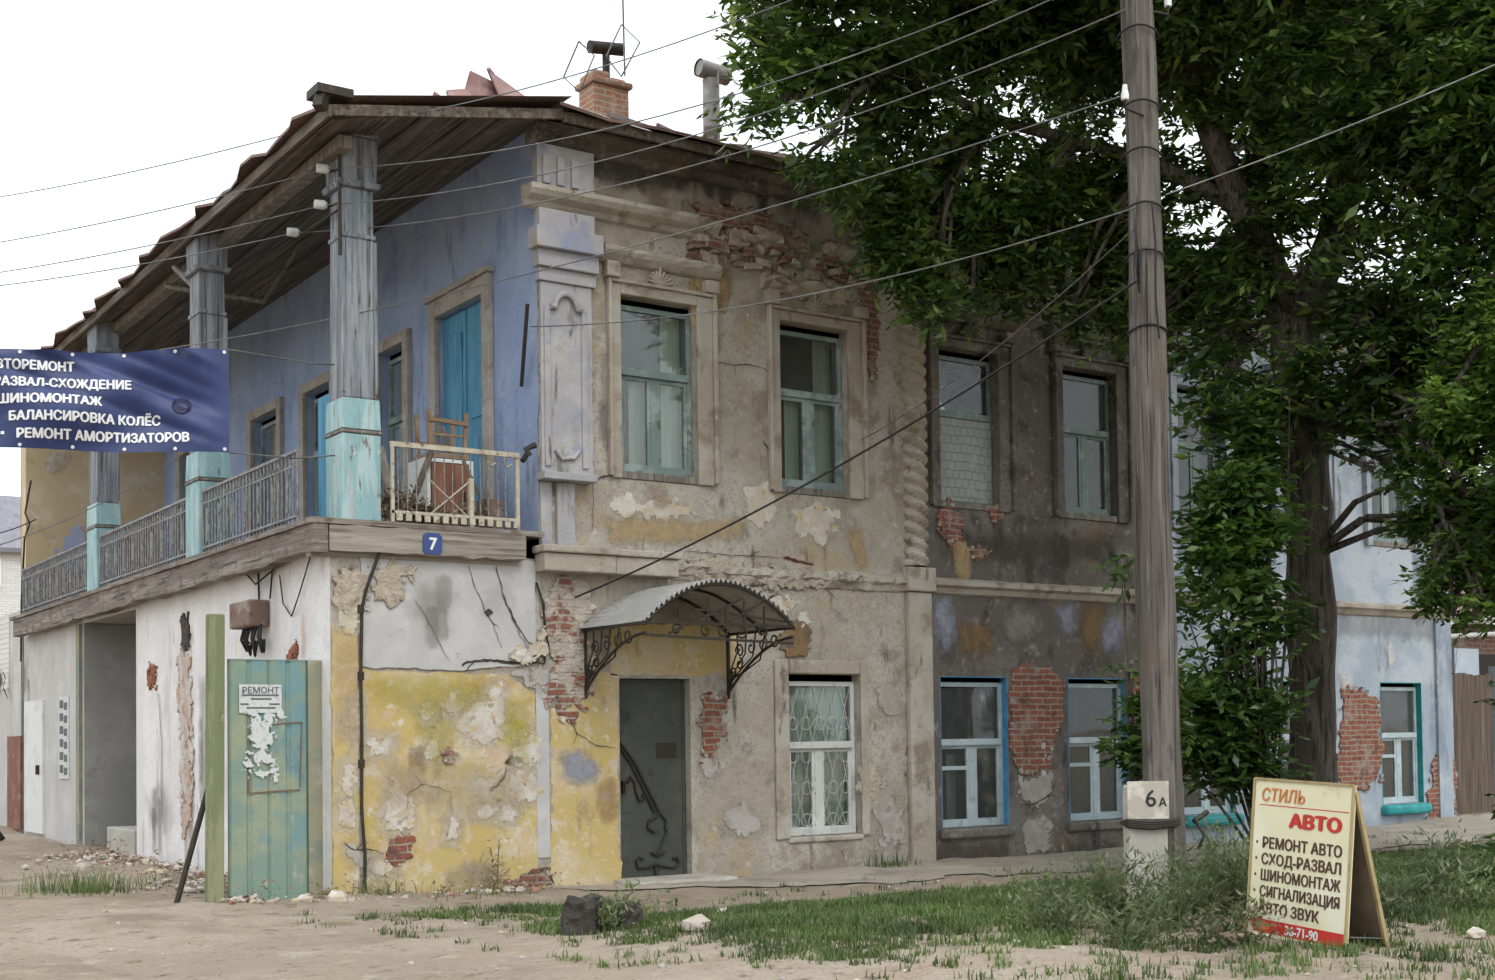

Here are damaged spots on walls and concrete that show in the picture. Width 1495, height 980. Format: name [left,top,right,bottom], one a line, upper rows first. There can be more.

spalling [680,199,881,383]
peeling [609,492,697,523]
peeling [743,480,841,546]
spalling [936,497,993,562]
spalling [331,557,418,635]
peeling [338,703,418,876]
spalling [418,575,598,823]
crack [416,566,616,748]
spalling [696,692,728,784]
spalling [1007,661,1066,855]
spalling [1336,684,1385,791]
spalling [503,866,557,888]